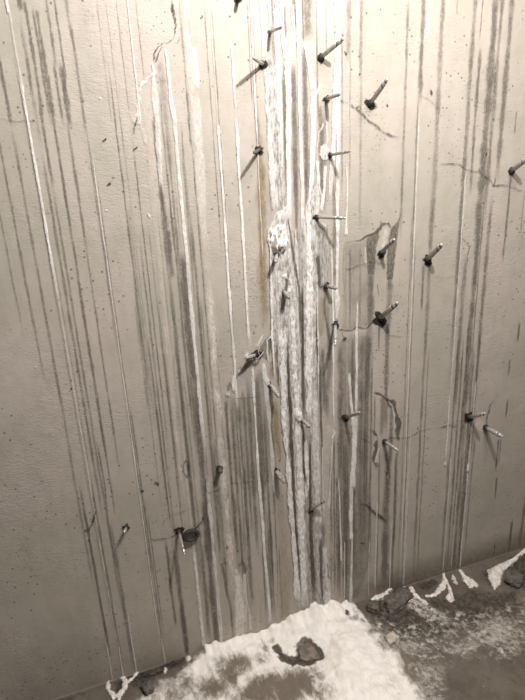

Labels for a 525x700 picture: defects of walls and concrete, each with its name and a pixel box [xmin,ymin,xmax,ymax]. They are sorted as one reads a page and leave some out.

damp [17,0,71,289]
damp [183,0,200,149]
crack [341,100,395,137]
damp [62,272,95,408]
damp [152,52,275,653]
damp [250,0,380,609]
damp [368,0,524,595]